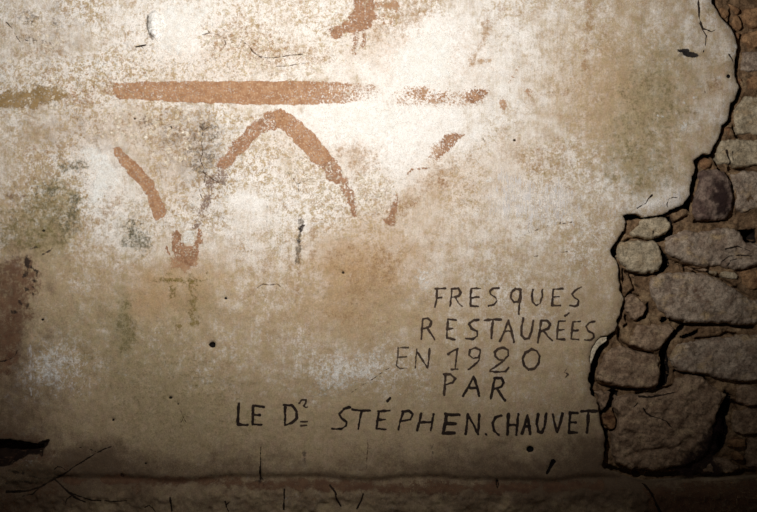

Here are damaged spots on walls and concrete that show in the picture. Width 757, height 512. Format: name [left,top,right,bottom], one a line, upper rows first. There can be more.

spalling [588,0,757,480]
damp [0,256,38,374]
crack [6,446,127,503]